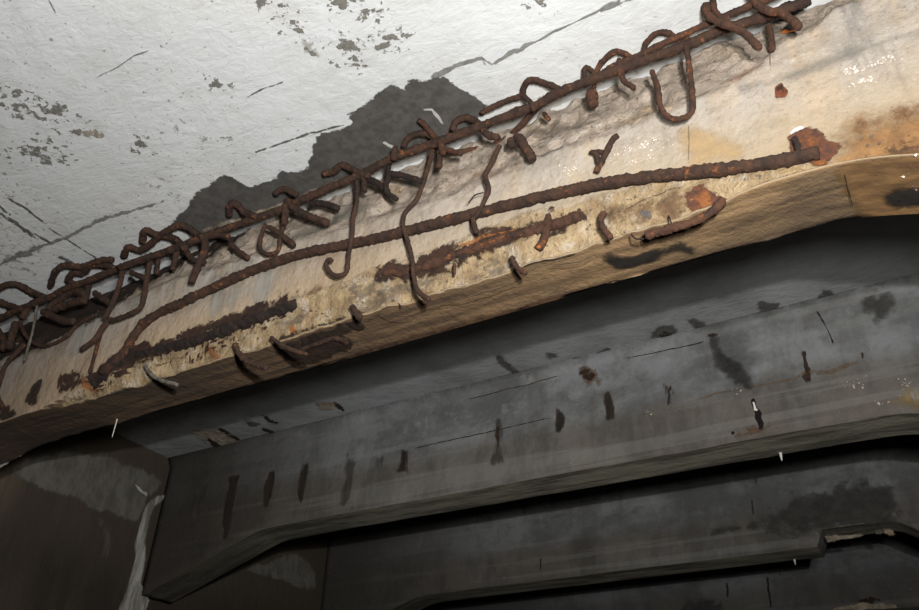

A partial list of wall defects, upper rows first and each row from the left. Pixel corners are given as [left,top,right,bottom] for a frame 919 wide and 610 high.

crack [432,0,630,78]
corrosion [775,83,788,97]
corrosion [788,108,919,216]
crack [0,198,164,265]
spalling [0,0,860,408]
corrosion [374,208,587,283]
corrosion [604,243,694,269]
corrosion [607,184,726,222]
corrosion [25,379,42,406]
corrosion [57,287,321,395]
corrosion [573,357,599,384]
spalling [751,398,764,429]